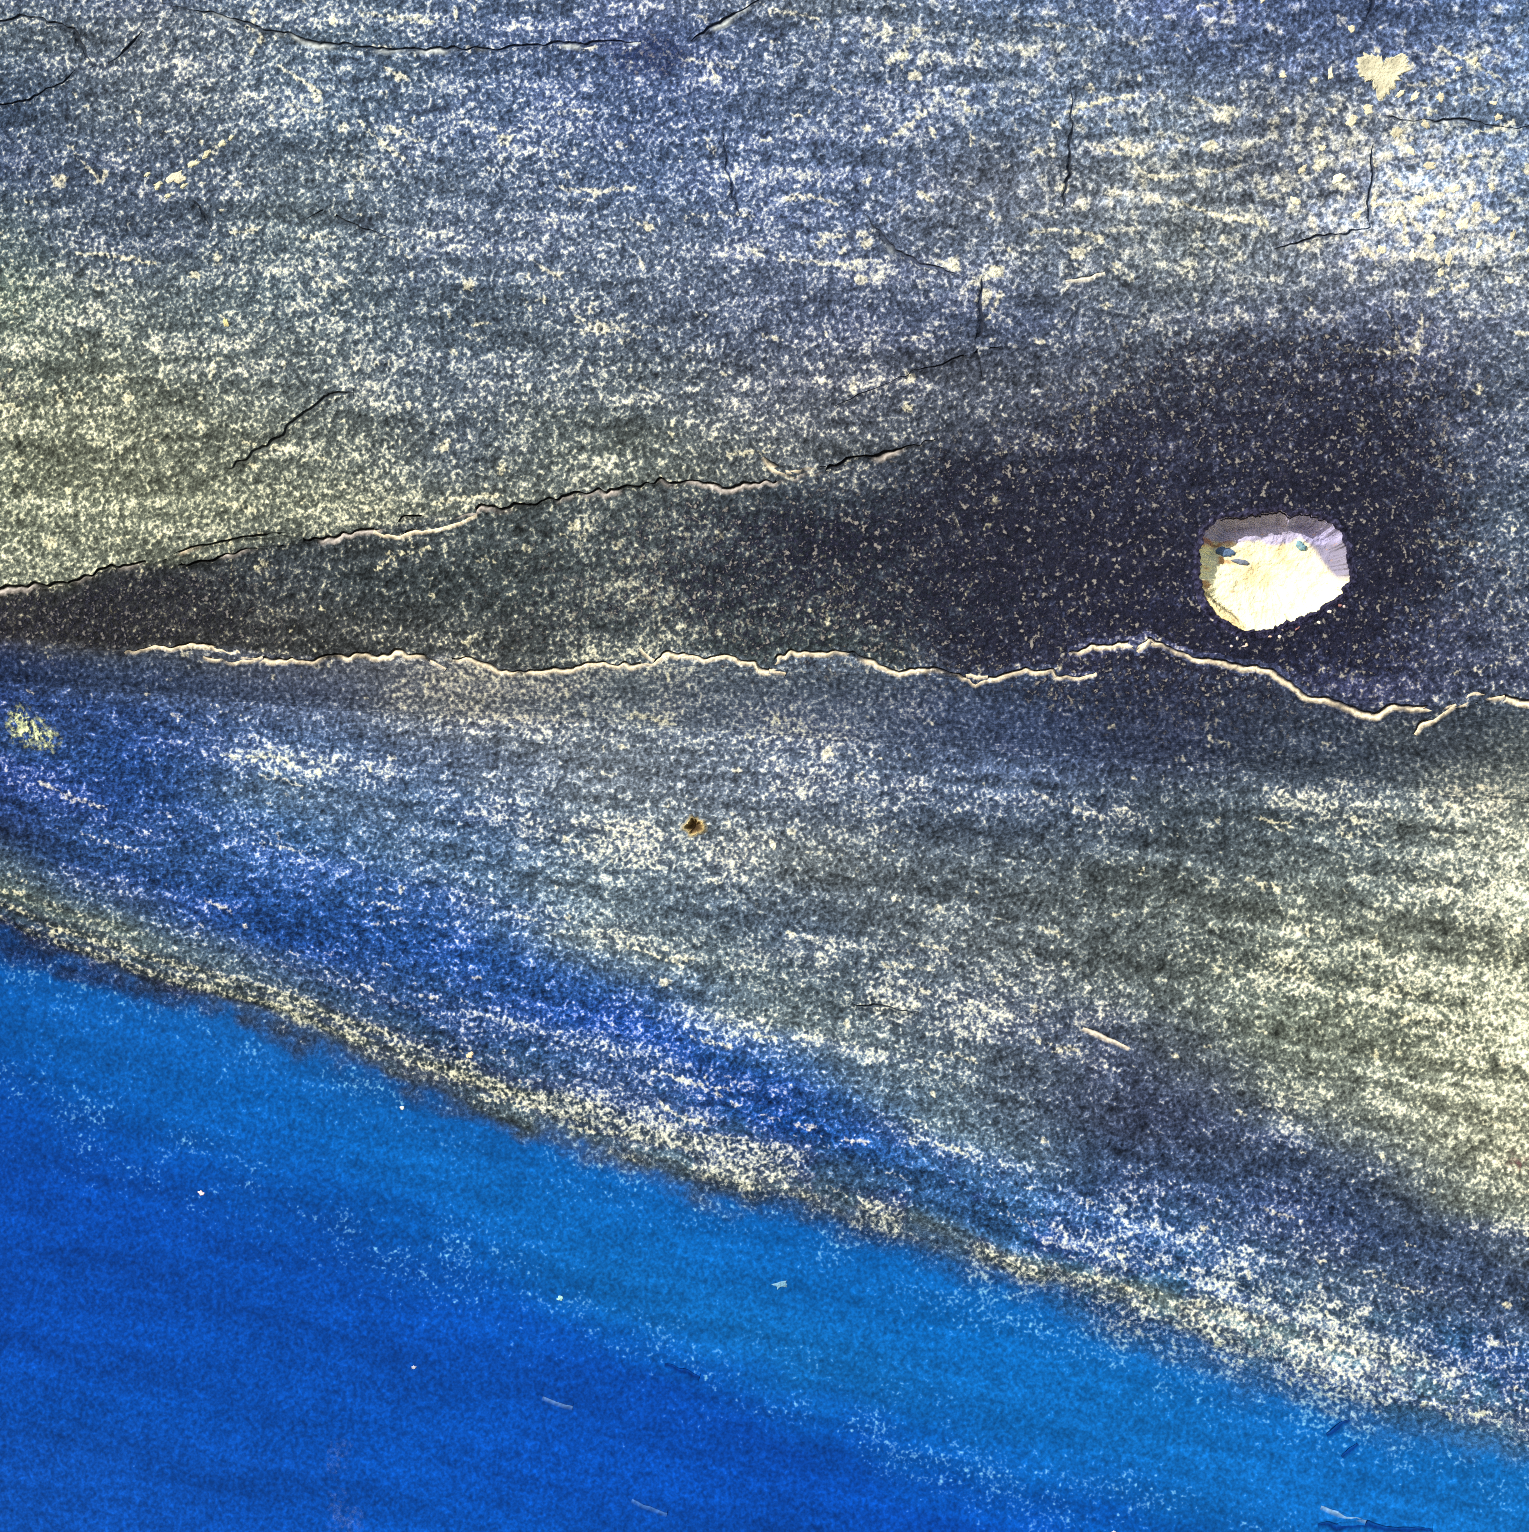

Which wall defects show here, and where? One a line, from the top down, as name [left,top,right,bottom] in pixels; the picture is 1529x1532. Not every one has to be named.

crack [0,0,641,113]
crack [189,196,218,233]
crack [833,208,1004,412]
crack [227,385,353,475]
crack [0,433,940,600]
spalling [1189,503,1360,648]
crack [121,631,1529,737]